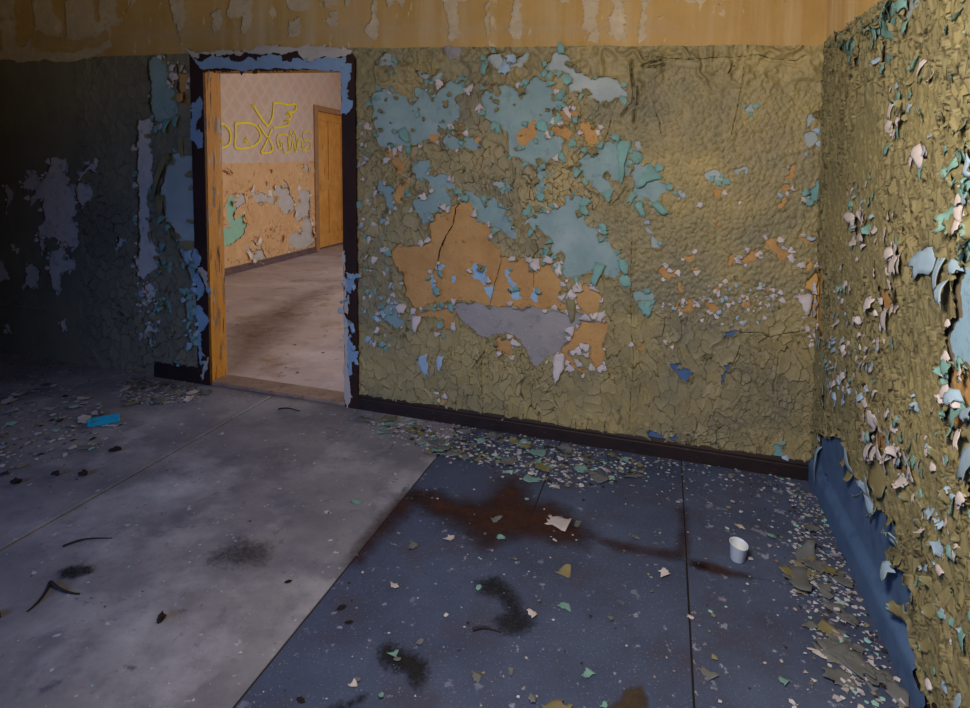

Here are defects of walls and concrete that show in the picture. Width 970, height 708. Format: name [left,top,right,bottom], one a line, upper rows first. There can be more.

peeling [0,0,132,63]
crack [605,55,804,139]
peeling [115,0,353,380]
crack [437,201,465,271]
peeling [338,0,970,708]